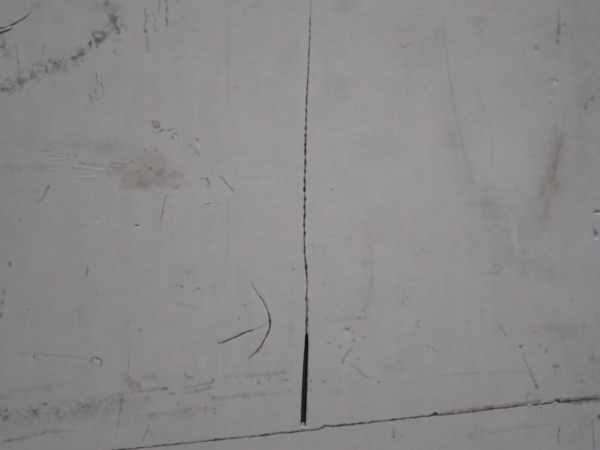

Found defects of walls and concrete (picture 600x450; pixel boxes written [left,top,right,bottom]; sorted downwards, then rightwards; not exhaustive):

crack [202,71,600,442]